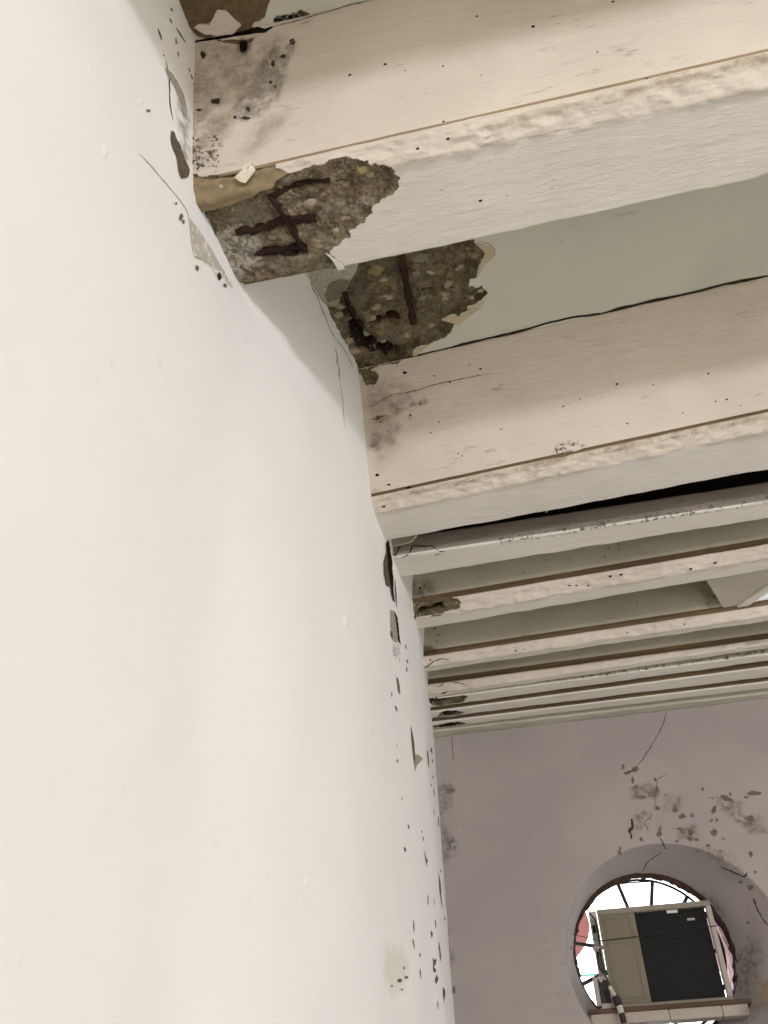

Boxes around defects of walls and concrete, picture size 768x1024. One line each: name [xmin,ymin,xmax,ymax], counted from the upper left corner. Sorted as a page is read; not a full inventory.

peeling [163,0,270,115]
damp [233,39,296,119]
damp [180,108,223,169]
spalling [171,131,495,385]
crack [404,275,768,359]
flaking render [383,541,408,711]
spalling [413,598,461,619]
spalling [429,695,468,728]
peeling [411,728,435,796]
crack [626,715,666,870]
peeling [413,870,445,1004]